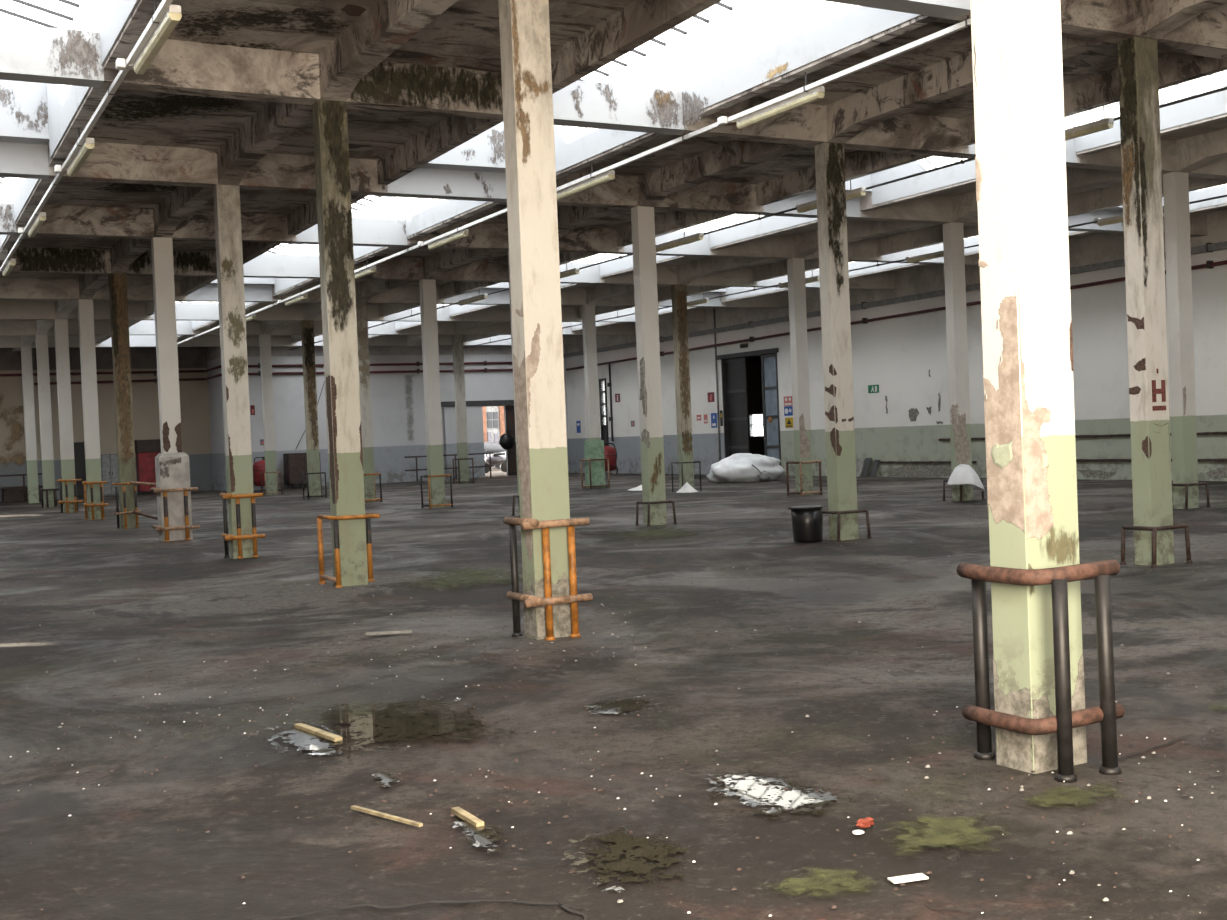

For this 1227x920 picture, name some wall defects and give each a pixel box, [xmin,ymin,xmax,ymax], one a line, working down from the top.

peeling [0,88,48,131]
water stain [318,62,503,331]
water stain [1118,37,1148,288]
water stain [358,328,370,386]
spalling [1126,314,1145,330]
spalling [1133,358,1146,371]
water stain [0,399,25,465]
spalling [513,323,541,562]
spalling [825,364,854,456]
spalling [889,403,970,477]
spalling [983,289,1053,539]